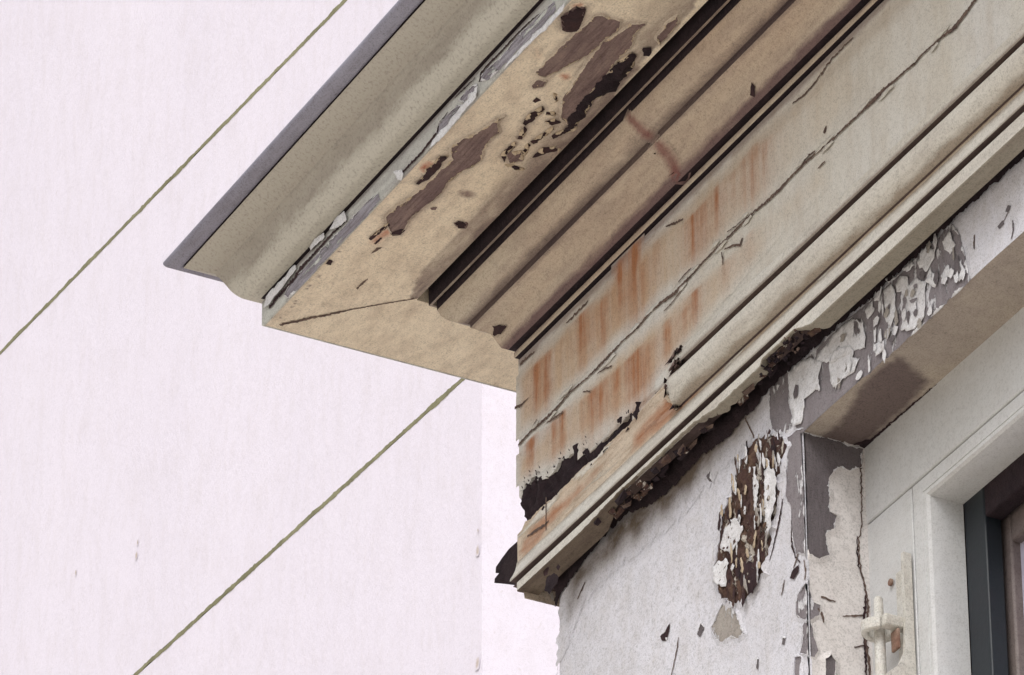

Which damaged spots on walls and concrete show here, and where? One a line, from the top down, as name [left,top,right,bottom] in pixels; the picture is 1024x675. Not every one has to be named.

peeling [264,2,564,308]
peeling [501,13,681,171]
corrosion [516,58,865,487]
crack [515,0,976,446]
peeling [792,37,853,104]
peeling [697,223,970,647]
crack [769,384,937,675]
damp [818,351,937,446]